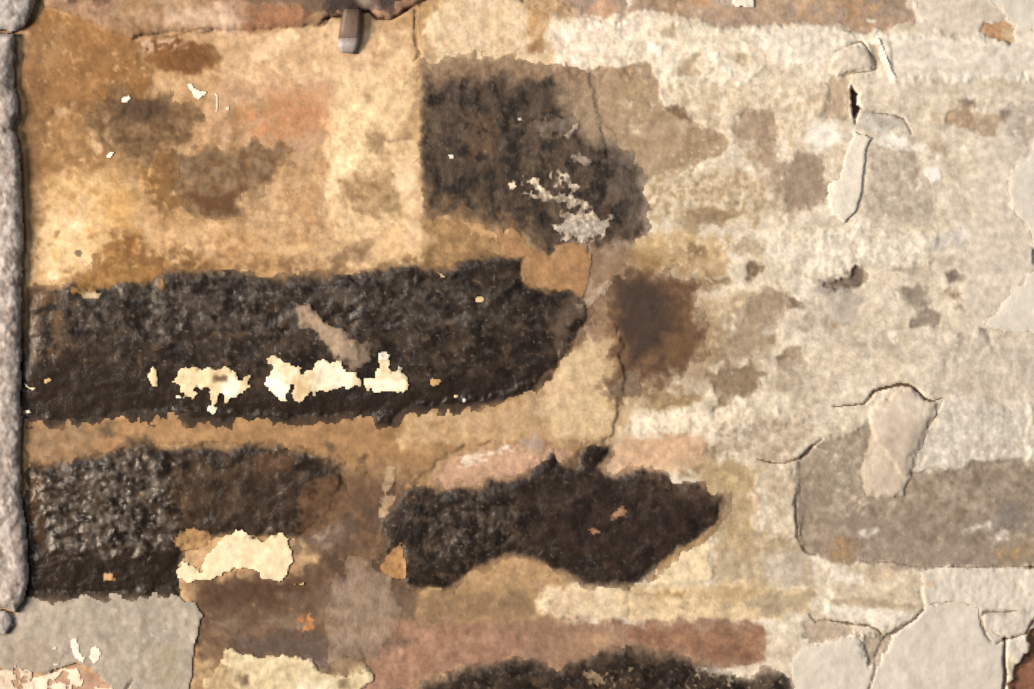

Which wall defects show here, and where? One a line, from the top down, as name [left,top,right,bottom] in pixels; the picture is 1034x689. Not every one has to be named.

damp [518,113,581,140]
damp [508,150,616,243]
peeling [148,366,158,386]
peeling [172,366,250,414]
peeling [265,351,409,403]
crack [833,382,944,457]
flaking render [795,423,1034,570]
crack [850,560,1034,569]
peeling [0,638,113,689]
crack [801,609,925,689]
crack [980,610,1034,689]
flaking render [1007,628,1034,689]